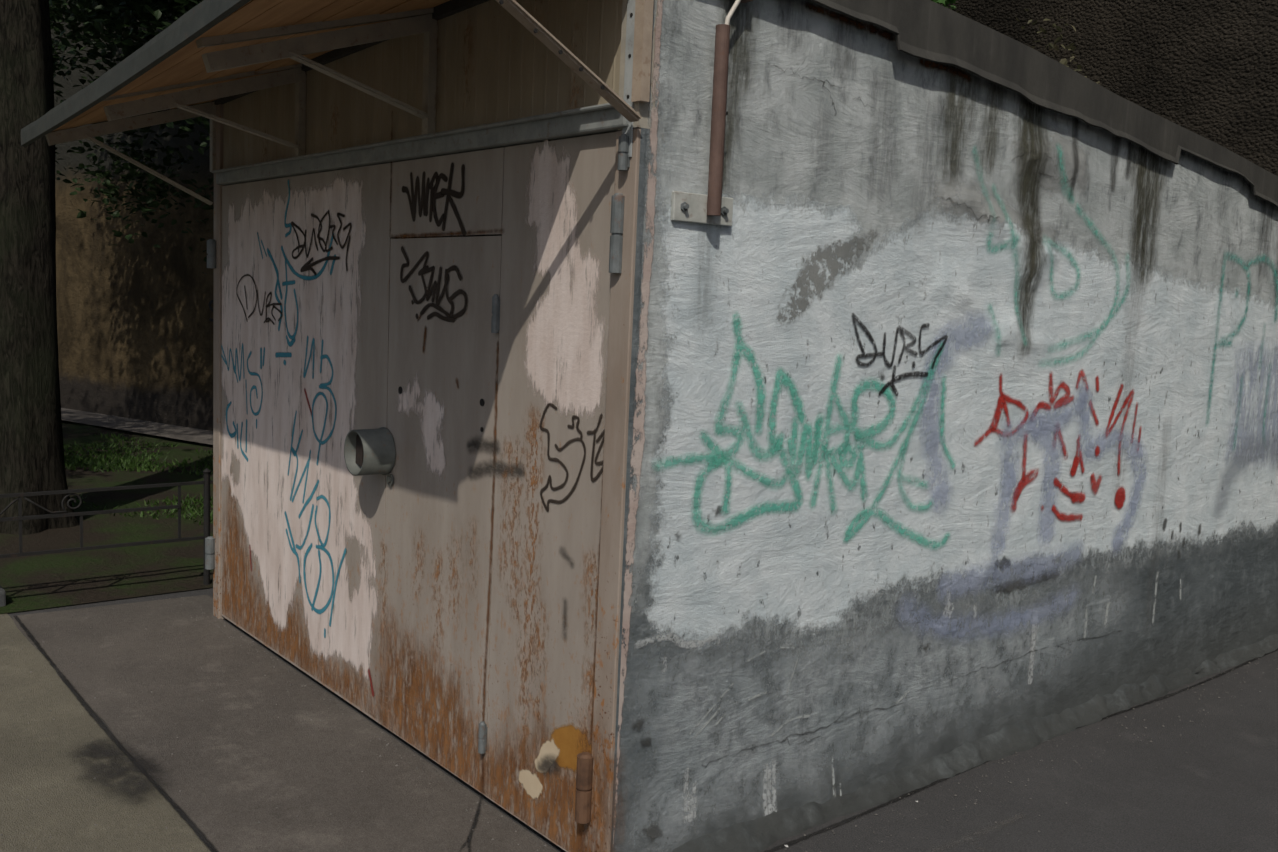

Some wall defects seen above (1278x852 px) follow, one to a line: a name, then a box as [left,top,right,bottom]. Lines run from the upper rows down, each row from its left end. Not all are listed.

water stain [944,65,1003,175]
water stain [1020,99,1045,347]
water stain [1069,118,1078,198]
water stain [1112,137,1167,281]
corrosion [222,342,600,852]